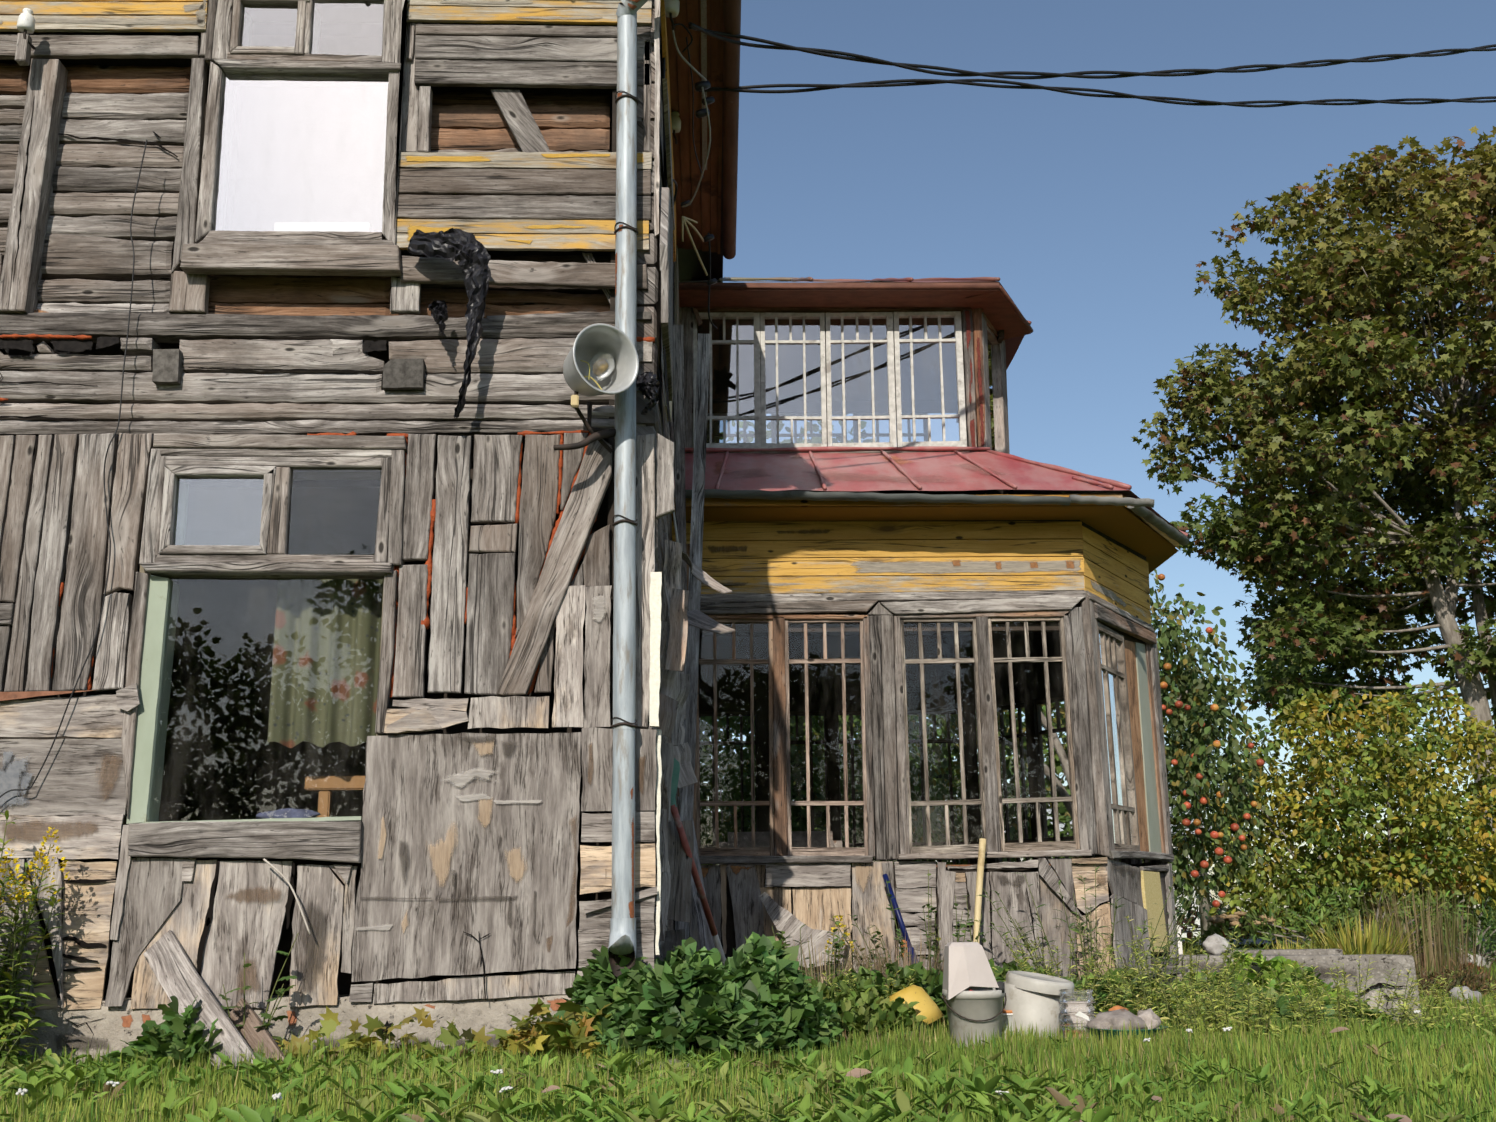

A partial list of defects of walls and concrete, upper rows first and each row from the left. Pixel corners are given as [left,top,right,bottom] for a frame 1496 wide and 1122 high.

peeling [35,0,206,27]
peeling [408,225,460,241]
peeling [508,224,585,244]
peeling [765,560,1126,607]
peeling [456,793,542,804]